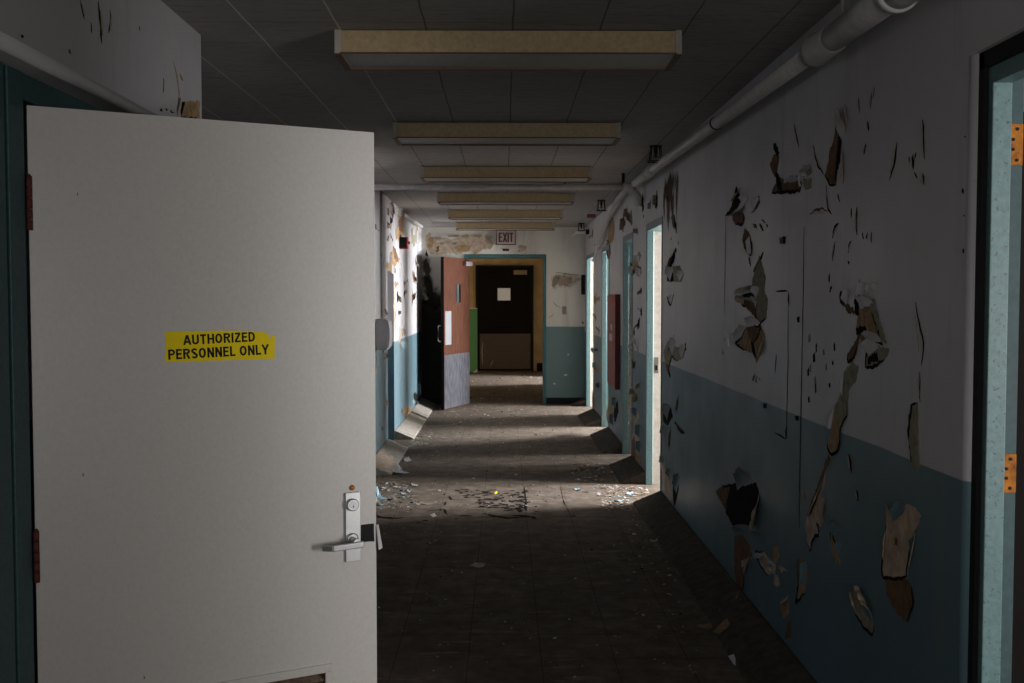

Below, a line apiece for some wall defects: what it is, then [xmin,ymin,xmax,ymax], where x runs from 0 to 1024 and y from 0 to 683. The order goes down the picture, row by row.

flaking render [177,98,200,119]
peeling [770,143,802,195]
peeling [824,105,848,187]
peeling [385,202,493,350]
peeling [664,266,684,306]
peeling [725,187,768,363]
peeling [663,336,686,378]
peeling [715,279,889,639]
peeling [907,402,920,472]
peeling [881,500,921,622]